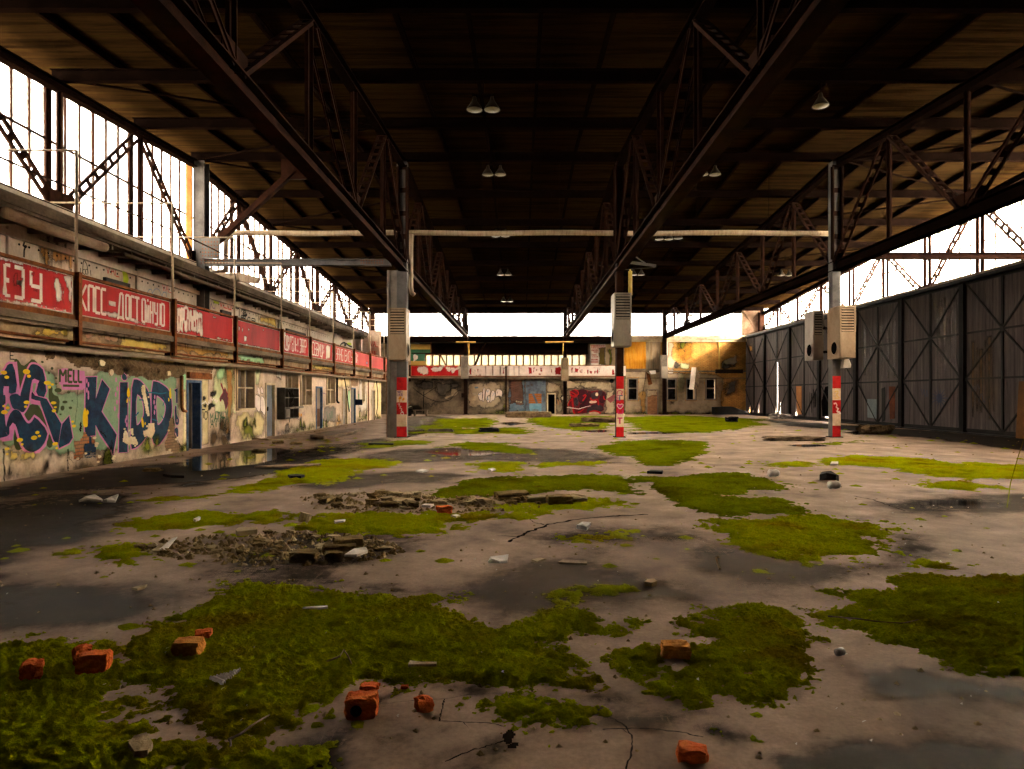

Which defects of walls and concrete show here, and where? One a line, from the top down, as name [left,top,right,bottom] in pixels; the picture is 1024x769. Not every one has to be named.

leakage [0,416,613,631]
crack [498,514,648,542]
leakage [882,494,1024,516]
leakage [464,558,706,617]
crack [603,717,703,769]